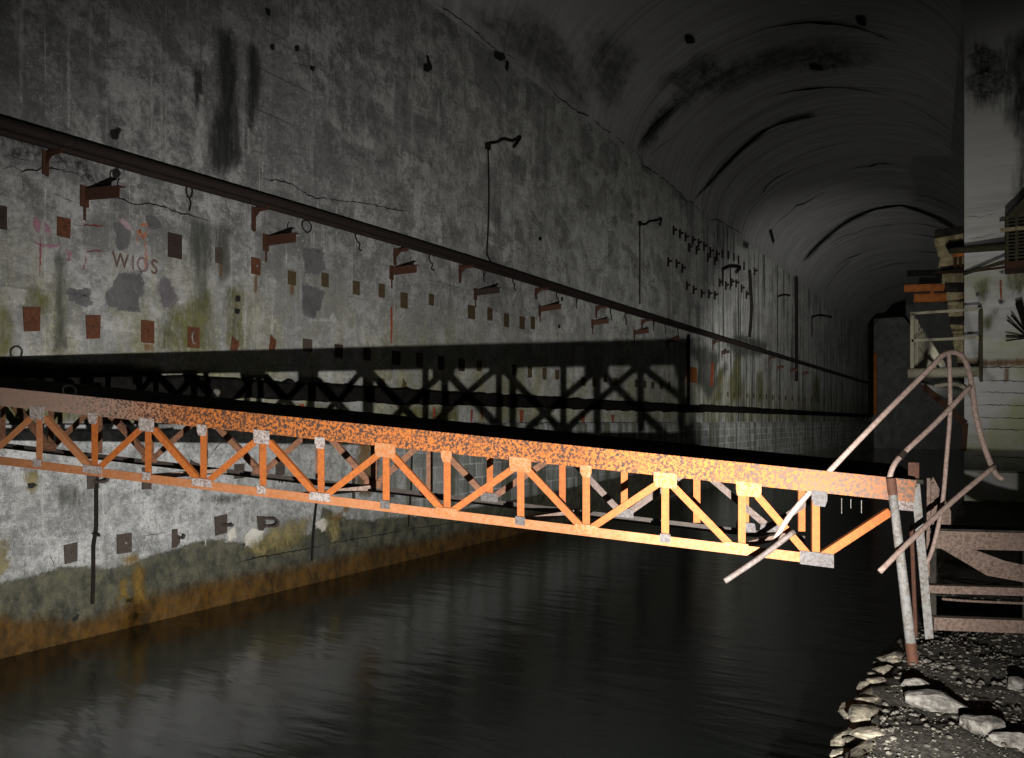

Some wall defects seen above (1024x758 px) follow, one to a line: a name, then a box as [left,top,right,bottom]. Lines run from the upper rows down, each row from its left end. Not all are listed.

damp [194,33,260,171]
damp [975,36,1024,197]
crack [1,157,217,252]
crack [242,171,407,212]
corrosion [358,444,371,495]
corrosion [0,525,533,659]
damp [0,474,683,656]